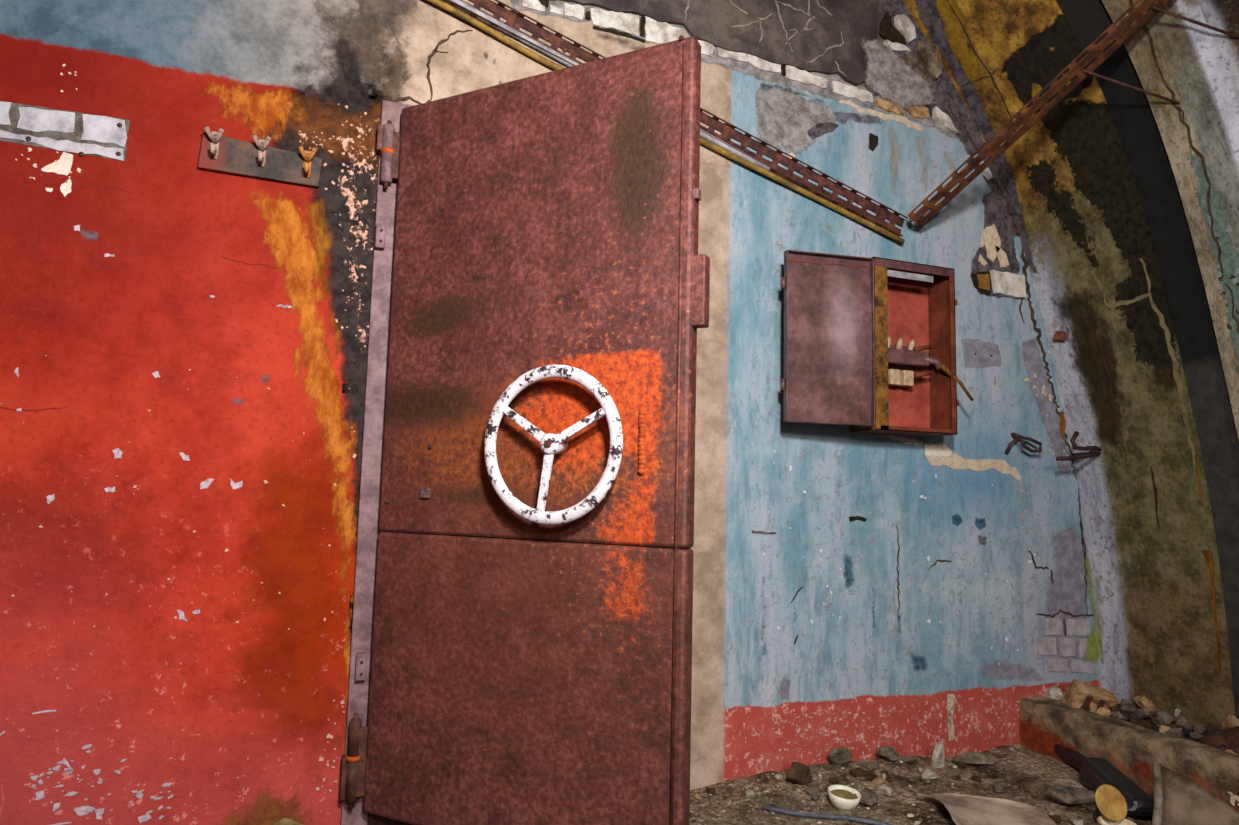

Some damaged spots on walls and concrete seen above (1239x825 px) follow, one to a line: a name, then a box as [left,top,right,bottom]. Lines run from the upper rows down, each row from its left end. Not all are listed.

crack [397,30,473,104]
crack [730,0,846,76]
flaking render [0,101,130,197]
corrosion [208,82,382,170]
peeling [510,0,1038,299]
leakage [1054,291,1123,446]
leakage [1154,364,1177,392]
corrosion [249,193,357,805]
flaking render [745,286,1095,793]
peeling [24,744,127,819]
peeling [126,782,173,823]